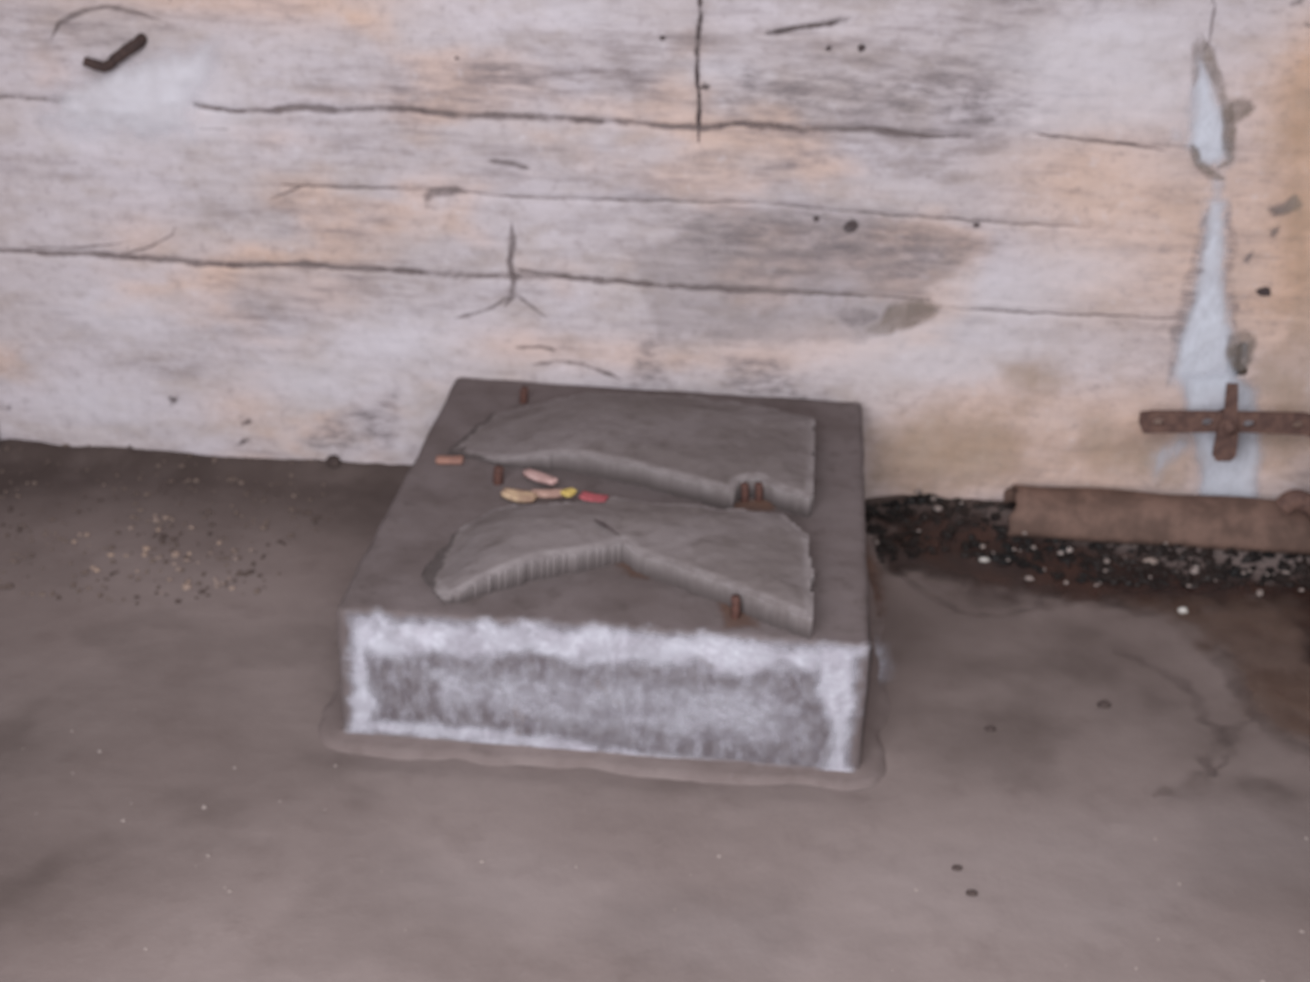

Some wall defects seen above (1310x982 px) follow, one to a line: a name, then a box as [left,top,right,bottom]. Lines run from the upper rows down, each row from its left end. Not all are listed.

crack [0,245,424,274]
crack [435,187,460,195]
crack [192,0,802,143]
crack [467,161,554,306]
crack [561,274,931,300]
crack [841,126,971,138]
damp [1158,202,1257,498]
damp [1192,50,1251,173]
rust [867,510,1310,659]
damp [1172,601,1310,735]